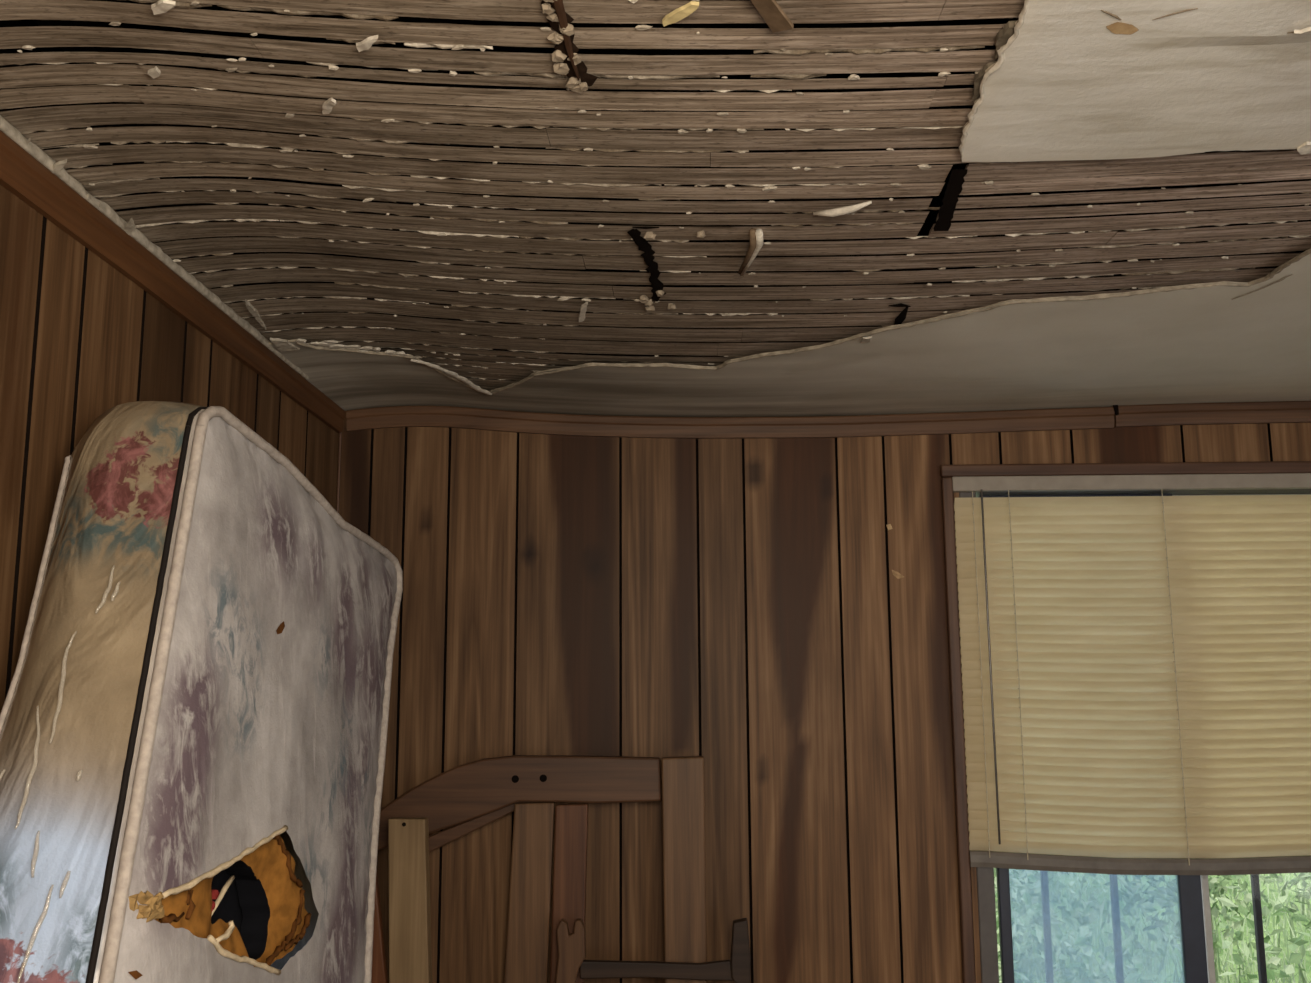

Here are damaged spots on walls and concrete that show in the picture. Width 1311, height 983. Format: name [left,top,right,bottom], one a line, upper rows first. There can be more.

peeling [151,0,176,15]
peeling [662,1,699,26]
peeling [1106,22,1138,35]
peeling [356,35,378,52]
peeling [148,66,161,79]
peeling [322,98,336,114]
spalling [934,0,1029,231]
crack [697,230,705,238]
peeling [0,115,1311,395]
crack [627,227,676,312]